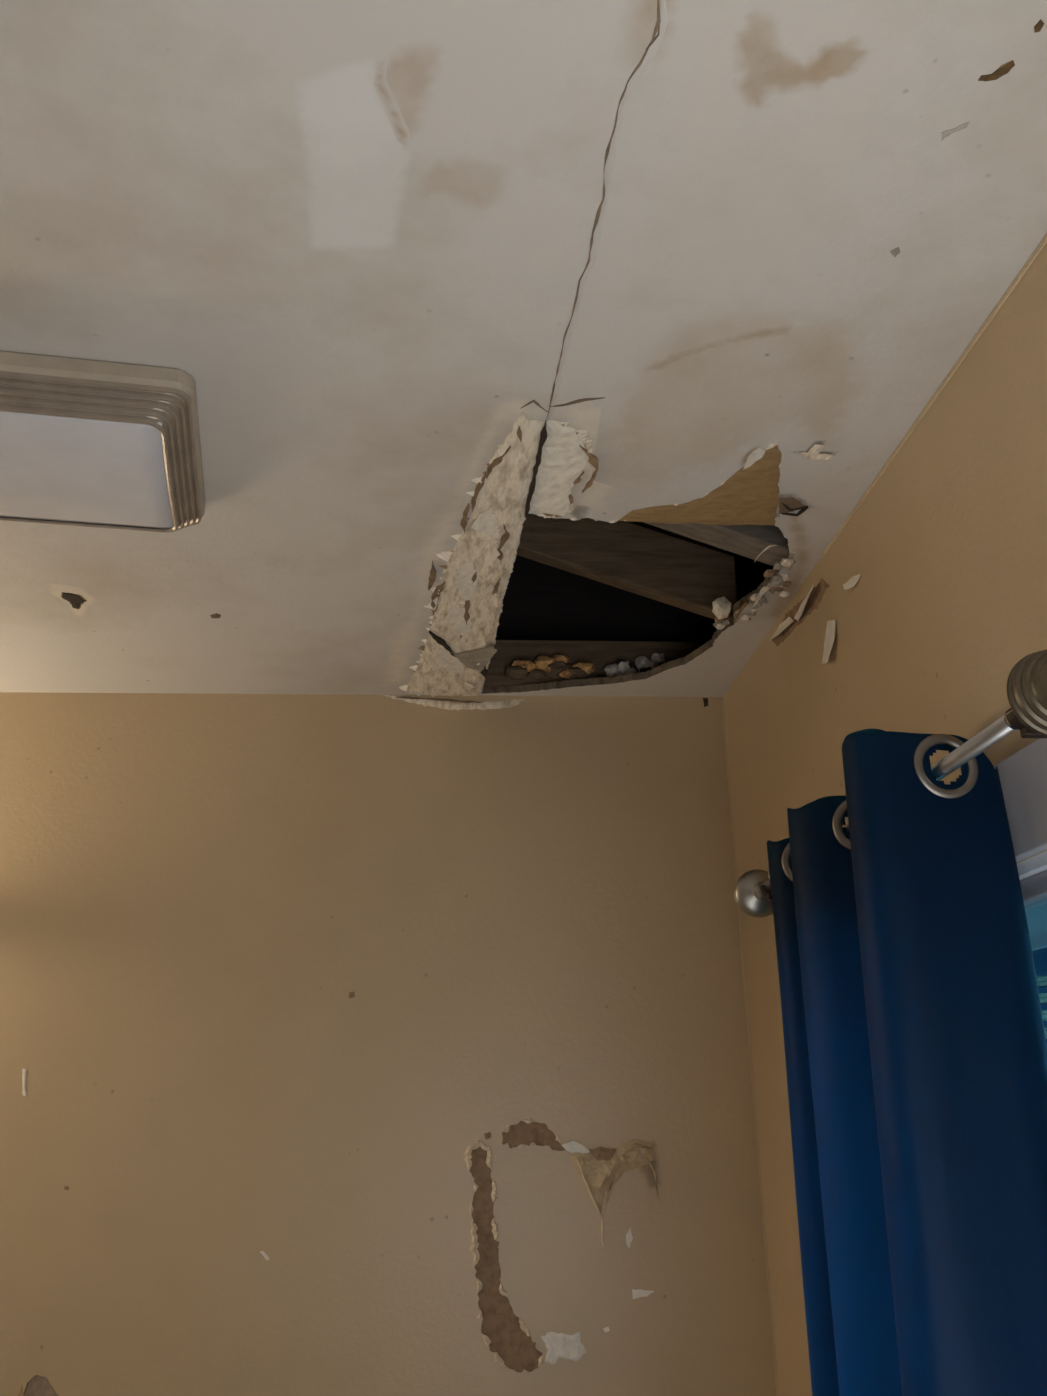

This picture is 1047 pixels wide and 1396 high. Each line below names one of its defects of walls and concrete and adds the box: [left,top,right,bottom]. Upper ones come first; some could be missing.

water stain [612,0,694,81]
water stain [730,5,876,116]
peeling [978,60,1015,81]
crack [521,0,668,517]
water stain [591,295,887,498]
peeling [378,394,622,697]
spalling [779,497,808,516]
peeling [47,582,100,619]
peeling [770,574,861,664]
peeling [562,1141,590,1154]
spalling [18,1375,58,1396]
peeling [541,1332,586,1364]